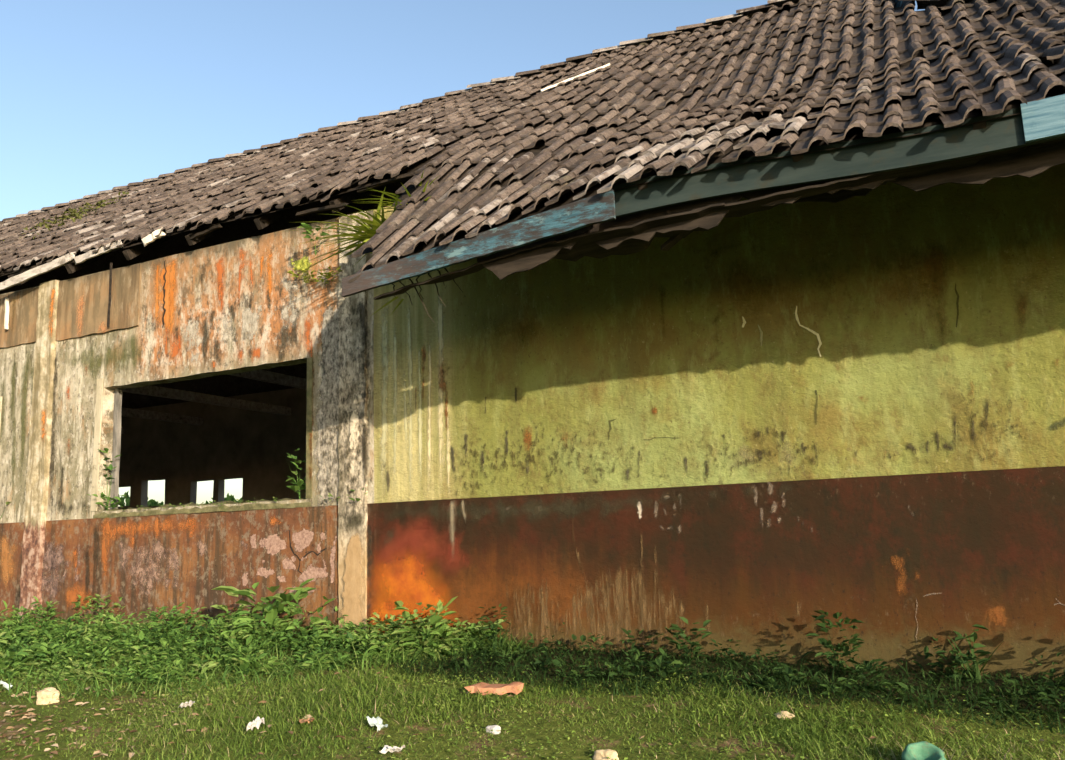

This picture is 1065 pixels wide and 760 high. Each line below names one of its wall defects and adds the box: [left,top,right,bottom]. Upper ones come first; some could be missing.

corrosion [155,261,181,358]
corrosion [216,259,224,310]
corrosion [238,251,272,297]
corrosion [305,319,314,399]
damp [1,363,15,483]
damp [314,306,339,505]
damp [705,428,820,477]
damp [907,388,1019,463]
flaking render [241,528,364,634]
corrosion [371,550,447,638]